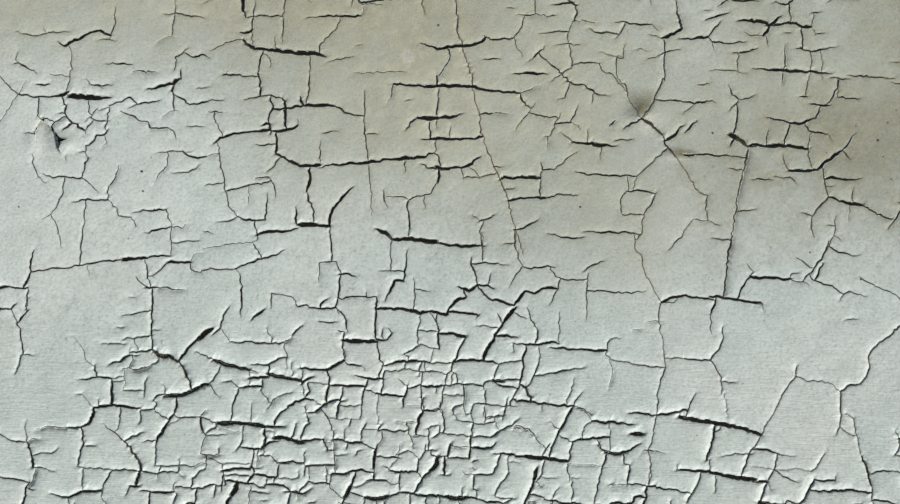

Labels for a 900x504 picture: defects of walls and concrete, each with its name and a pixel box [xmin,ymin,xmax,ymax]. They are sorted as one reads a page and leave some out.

crack [0,0,700,504]
crack [529,0,900,341]
crack [550,325,900,504]